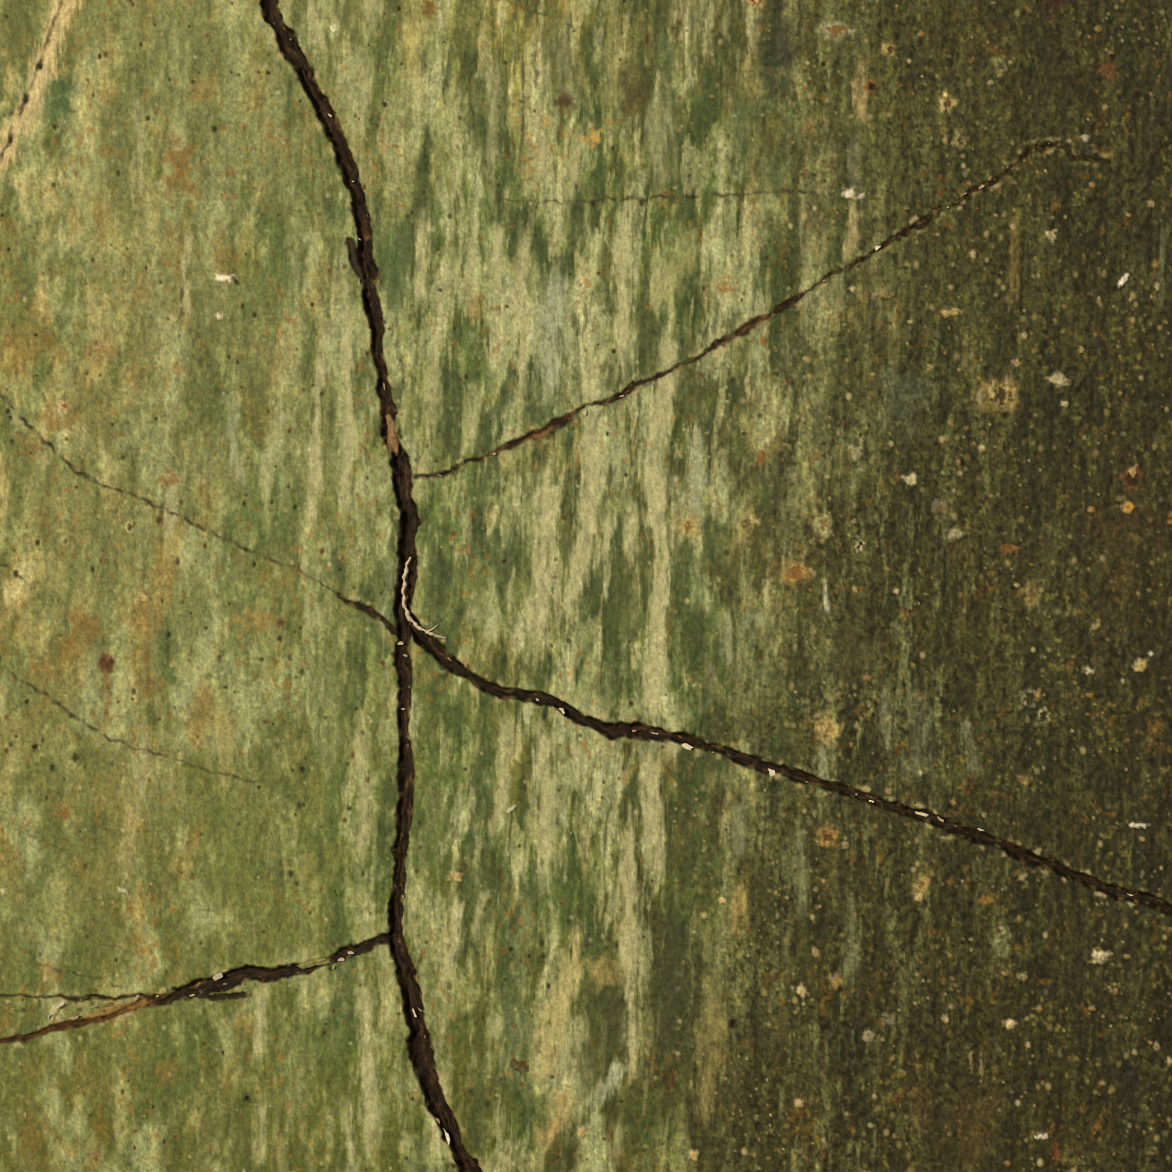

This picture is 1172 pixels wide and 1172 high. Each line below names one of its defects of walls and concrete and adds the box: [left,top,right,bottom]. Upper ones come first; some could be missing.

crack [0,0,65,166]
crack [177,268,185,334]
crack [0,390,339,596]
crack [258,0,1172,1172]
crack [6,669,264,784]
crack [0,932,395,1045]